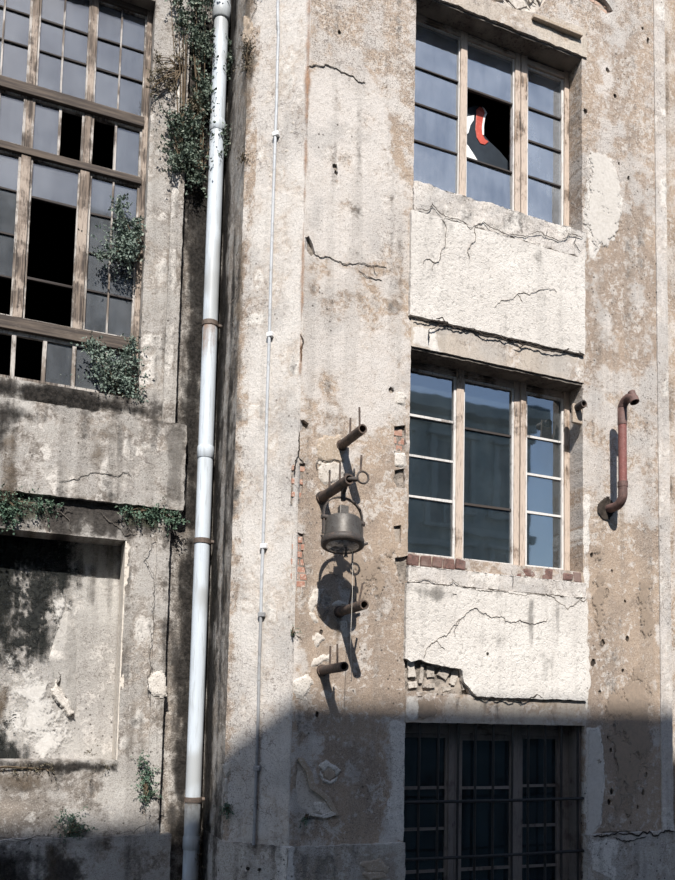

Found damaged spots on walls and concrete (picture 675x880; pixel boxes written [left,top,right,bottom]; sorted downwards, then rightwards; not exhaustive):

spalling [494,0,545,12]
crack [307,64,365,83]
peeling [583,151,628,250]
crack [314,253,386,281]
crack [418,203,583,270]
leakage [0,382,145,445]
leakage [0,466,43,518]
crack [415,571,588,657]
leakage [0,535,115,789]
spalling [405,660,468,695]
flaking render [296,758,339,819]
leakage [0,851,21,880]